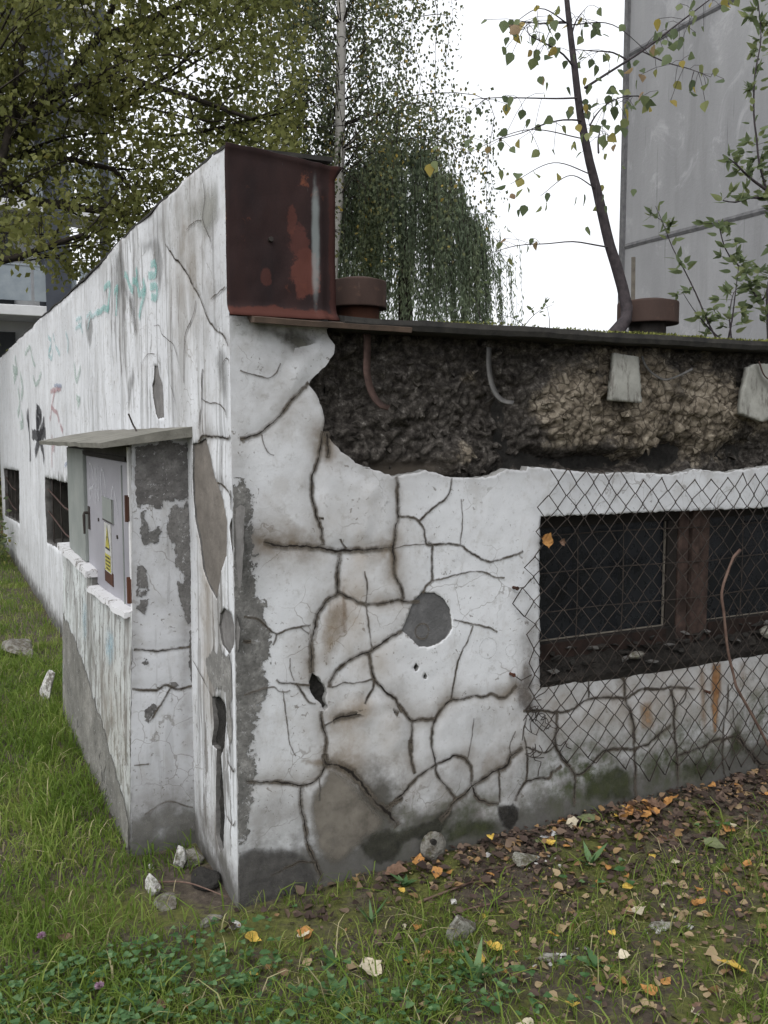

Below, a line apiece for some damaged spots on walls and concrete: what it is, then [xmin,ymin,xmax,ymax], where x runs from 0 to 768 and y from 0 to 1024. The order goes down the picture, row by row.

crack [142,244,309,455]
peeling [154,366,164,418]
spalling [309,331,768,478]
crack [132,645,211,721]
peeling [134,439,272,848]
spalling [309,673,325,708]
spalling [402,592,451,647]
crack [228,431,768,882]
rust [701,664,720,732]
damp [362,812,451,864]
damp [498,804,518,829]
damp [239,850,315,910]